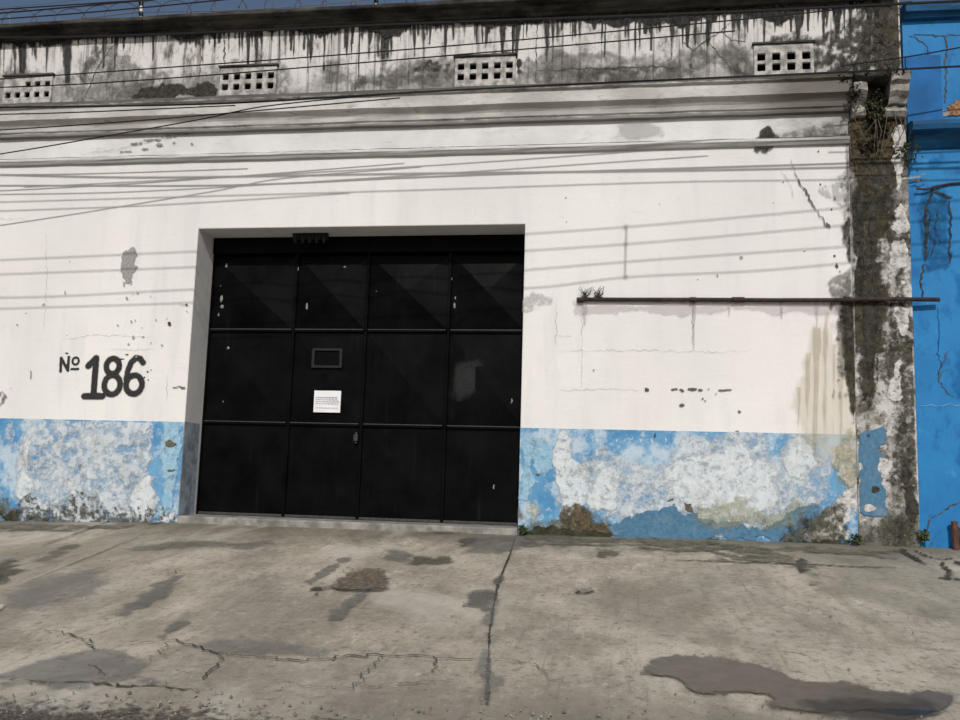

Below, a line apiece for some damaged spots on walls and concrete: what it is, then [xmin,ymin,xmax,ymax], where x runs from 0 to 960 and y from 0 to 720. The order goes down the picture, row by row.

leakage [0,0,901,82]
mould [132,81,218,99]
peeling [120,247,151,299]
crack [795,173,831,228]
leakage [919,186,953,297]
leakage [754,124,919,547]
peeling [5,420,182,523]
peeling [518,427,893,540]
crack [927,502,960,536]
crack [0,629,569,690]